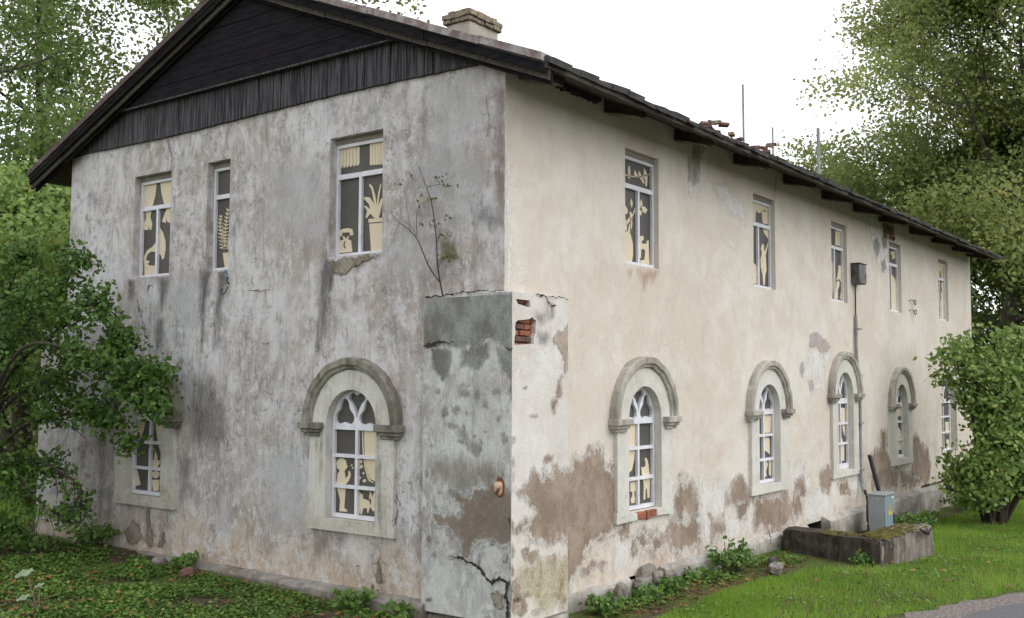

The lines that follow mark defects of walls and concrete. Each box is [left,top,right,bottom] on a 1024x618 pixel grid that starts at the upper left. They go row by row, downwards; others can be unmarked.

spalling [329,254,378,276]
damp [160,271,225,338]
crack [424,340,455,348]
spalling [514,299,533,345]
peeling [551,324,568,412]
peeling [810,332,829,353]
peeling [442,361,528,455]
peeling [819,464,850,494]
peeling [870,429,932,492]
spalling [124,508,165,548]
peeling [427,441,807,616]
crack [455,556,511,618]